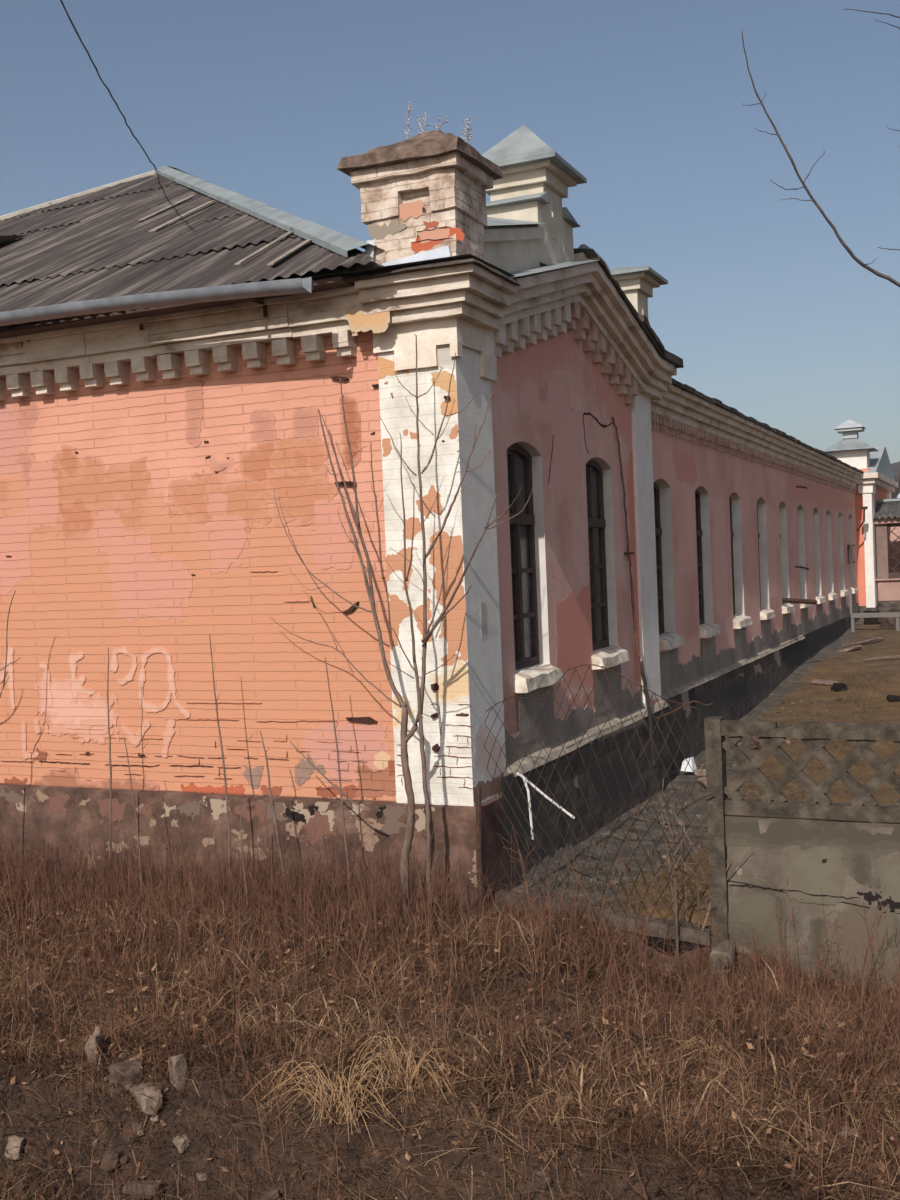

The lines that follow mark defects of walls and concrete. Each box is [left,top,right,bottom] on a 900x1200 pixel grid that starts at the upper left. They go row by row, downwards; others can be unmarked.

spalling [399,200,464,252]
damp [182,376,204,447]
peeling [378,357,409,399]
peeling [370,429,417,457]
peeling [431,371,458,442]
damp [0,397,415,801]
peeling [386,485,467,667]
spalling [0,754,435,870]
crack [732,884,859,900]